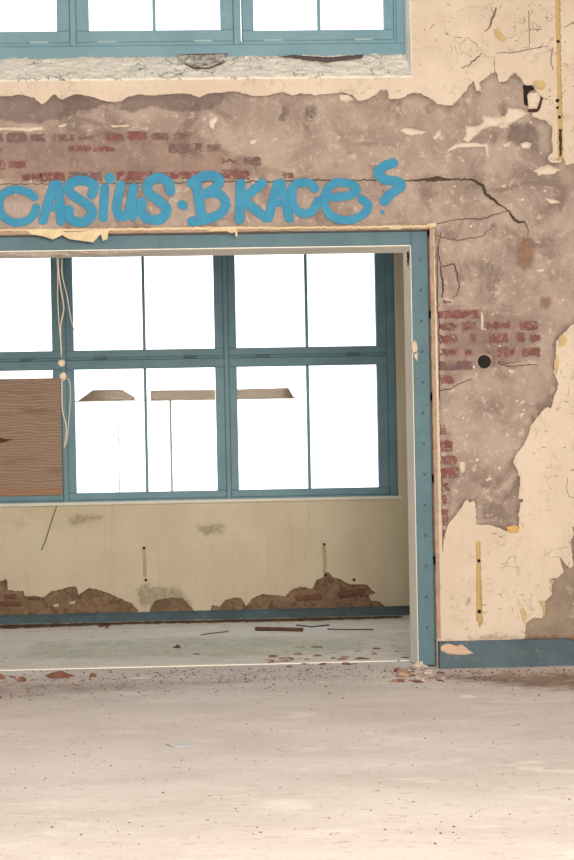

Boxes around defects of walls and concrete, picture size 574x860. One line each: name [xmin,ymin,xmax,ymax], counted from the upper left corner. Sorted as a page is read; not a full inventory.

spalling [0,73,574,550]
crack [404,176,529,481]
spalling [0,579,138,615]
spalling [150,597,193,612]
spalling [211,543,384,610]
spalling [520,527,574,640]
spalling [441,644,474,655]